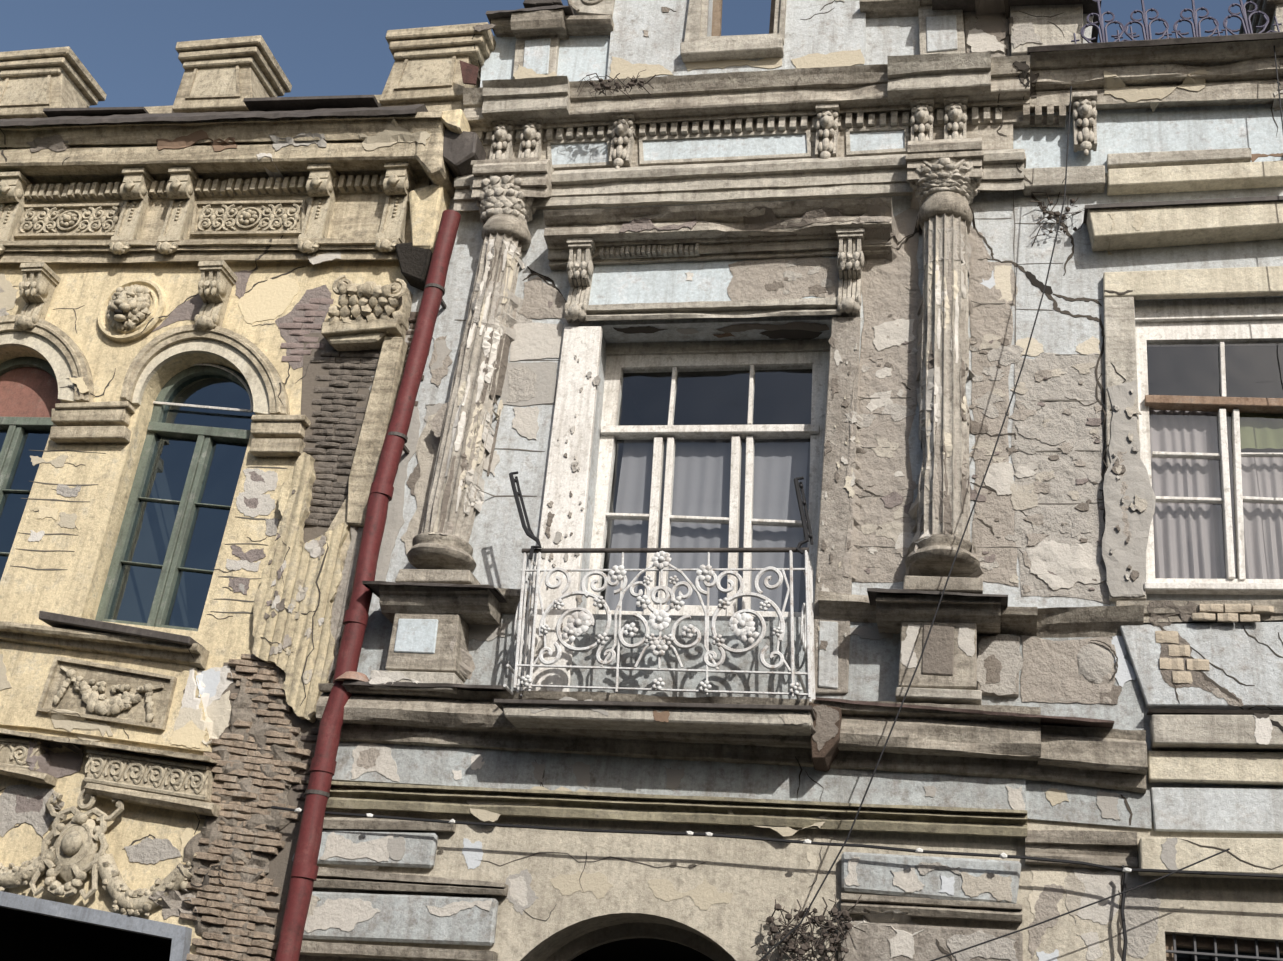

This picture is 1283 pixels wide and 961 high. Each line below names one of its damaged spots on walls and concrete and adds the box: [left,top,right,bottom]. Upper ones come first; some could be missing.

crack [969,0,1133,537]
flaking render [234,270,380,527]
spalling [401,401,448,554]
spalling [727,179,1274,745]
crack [970,482,1037,578]
spalling [369,670,422,690]
crack [1150,622,1283,731]
flaking render [124,654,319,961]
peeling [319,831,393,871]
peeling [350,742,400,782]
crack [480,851,705,921]
crack [1178,838,1283,870]